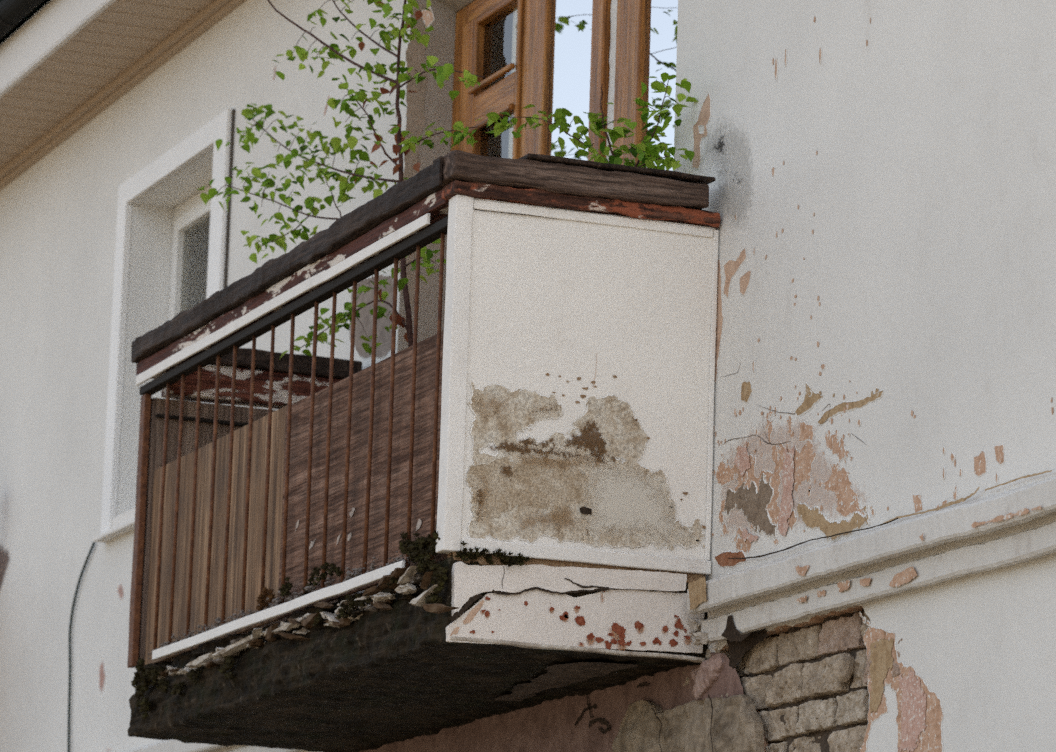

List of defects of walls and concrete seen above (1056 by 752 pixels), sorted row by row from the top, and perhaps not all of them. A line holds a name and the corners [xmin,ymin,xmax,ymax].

peeling [692,92,711,170]
peeling [714,247,767,383]
peeling [734,359,755,416]
crack [723,384,884,445]
peeling [701,380,889,568]
crack [728,470,1052,559]
peeling [913,493,923,513]
peeling [936,443,1005,511]
peeling [971,505,1041,528]
crack [451,566,681,621]
peeling [889,567,917,587]
flaking render [688,575,944,752]